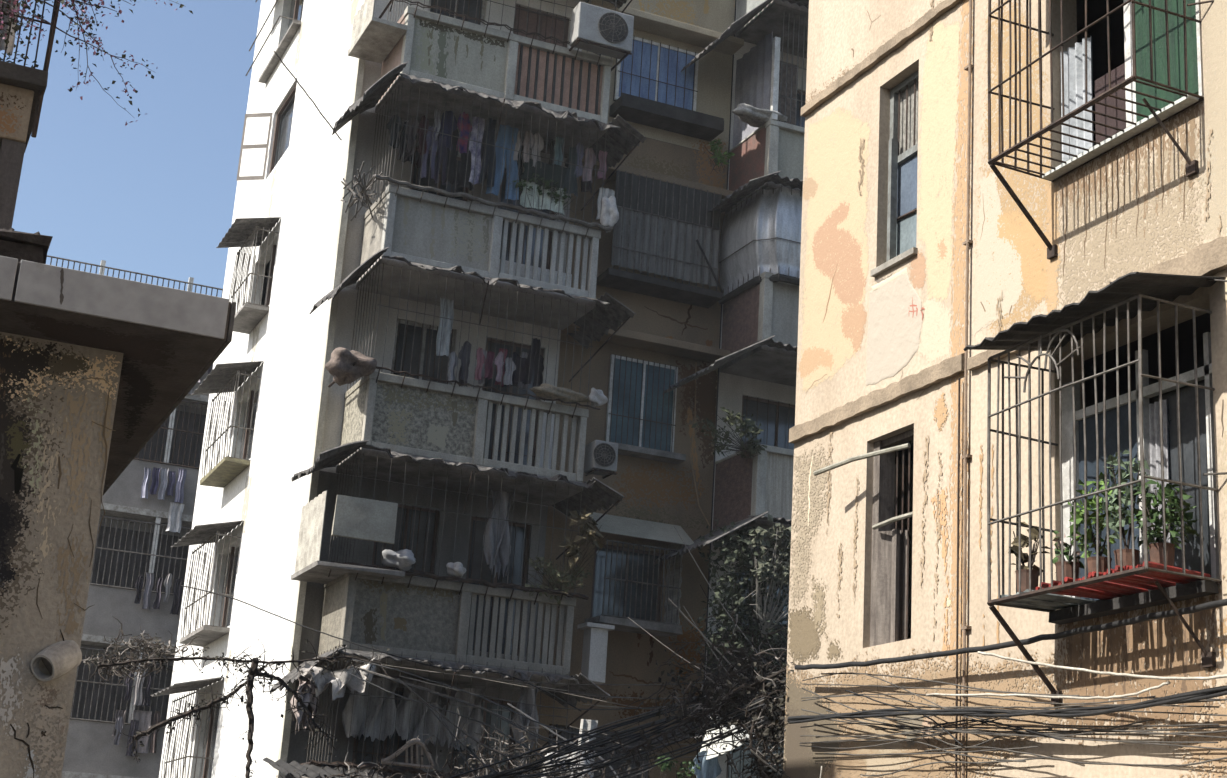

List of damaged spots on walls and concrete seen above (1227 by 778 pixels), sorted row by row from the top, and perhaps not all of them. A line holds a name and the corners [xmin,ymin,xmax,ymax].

peeling [797,19,961,400]
leakage [974,0,1227,335]
leakage [0,311,180,641]